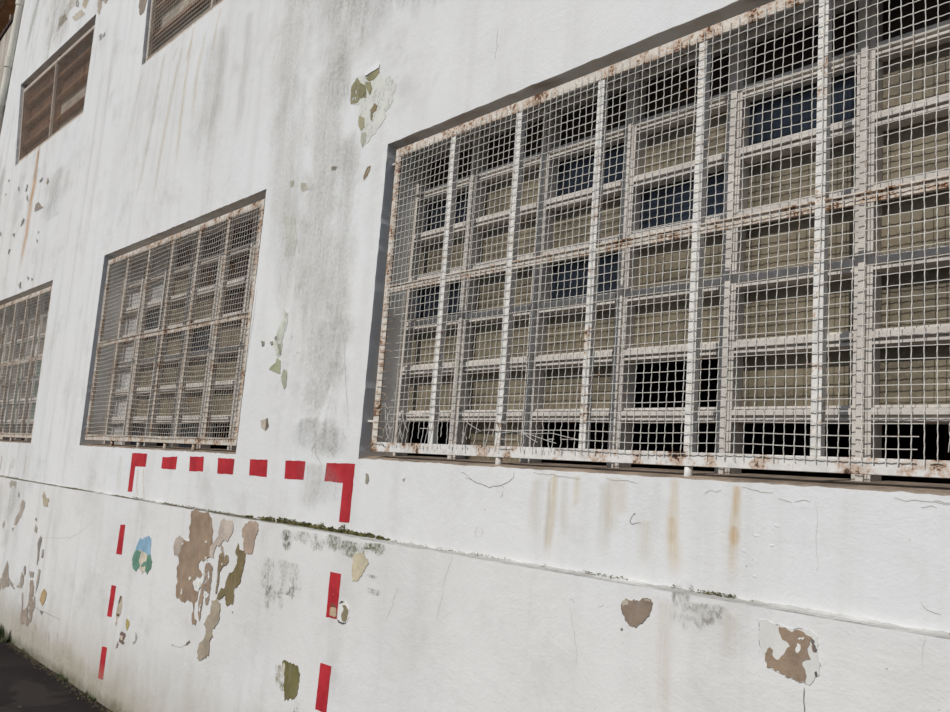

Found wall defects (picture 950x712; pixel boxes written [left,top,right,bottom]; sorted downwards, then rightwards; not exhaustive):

peeling [58,0,107,26]
peeling [350,62,396,148]
peeling [261,310,288,389]
peeling [2,480,25,532]
peeling [0,518,47,634]
peeling [132,536,152,574]
peeling [173,509,259,660]
peeling [352,552,369,581]
peeling [620,598,653,630]
peeling [758,619,821,685]
peeling [282,660,300,701]